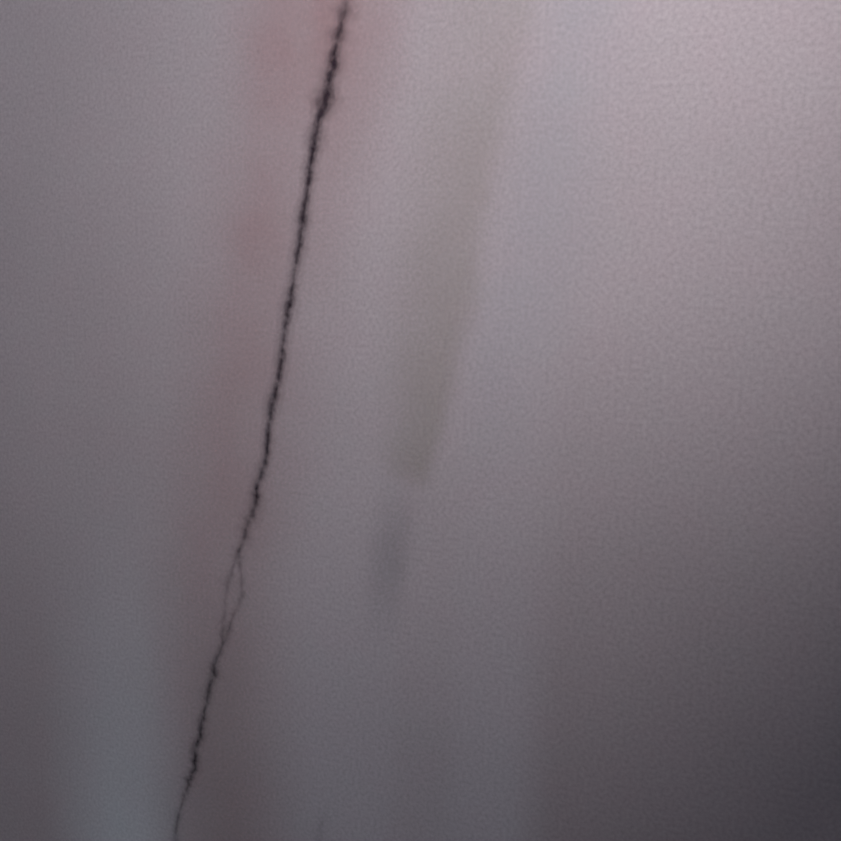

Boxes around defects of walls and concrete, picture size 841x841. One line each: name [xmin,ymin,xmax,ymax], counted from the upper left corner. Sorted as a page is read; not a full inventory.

crack [244,12,345,537]
crack [187,666,216,785]